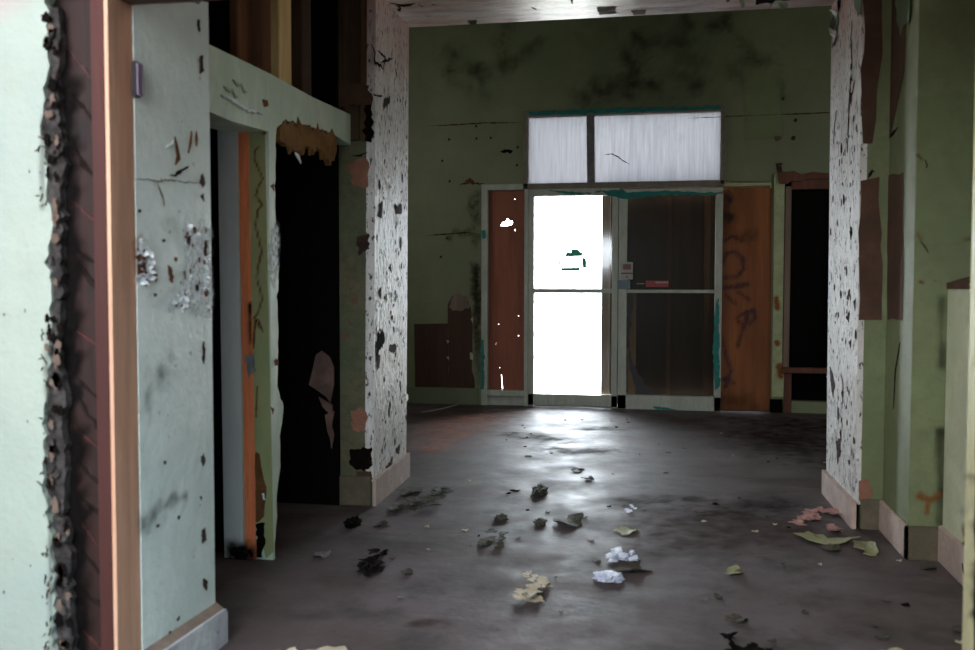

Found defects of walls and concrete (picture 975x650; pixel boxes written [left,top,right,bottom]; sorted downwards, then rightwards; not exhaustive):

crack [134,178,200,206]
peeling [348,157,408,225]
peeling [827,0,906,353]
peeling [356,233,378,255]
peeling [826,367,873,501]